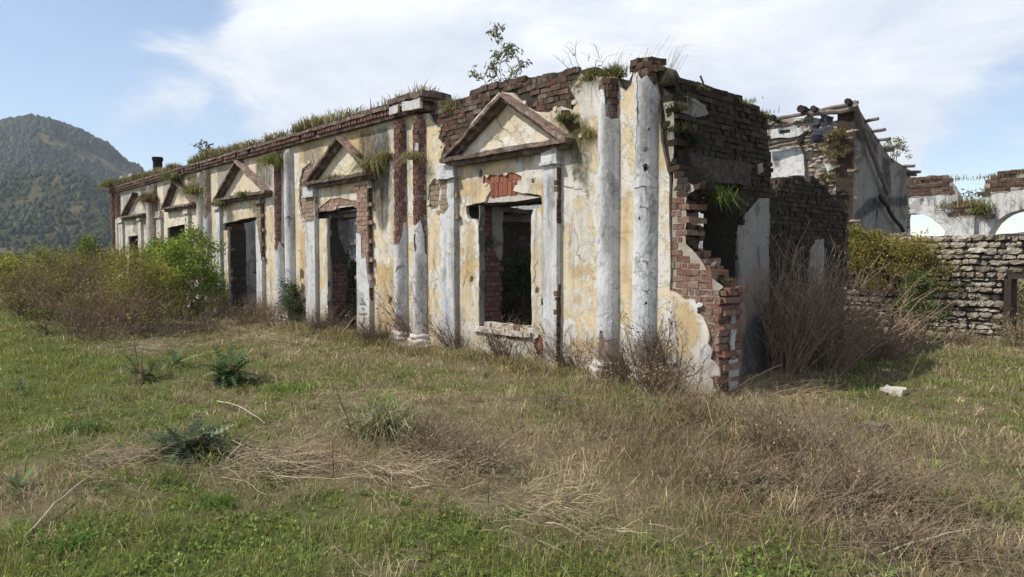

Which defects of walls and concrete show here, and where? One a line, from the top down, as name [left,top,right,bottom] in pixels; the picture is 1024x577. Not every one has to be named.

flaking render [300,160,374,301]
flaking render [389,66,619,257]
flaking render [479,169,561,364]
flaking render [635,61,861,397]